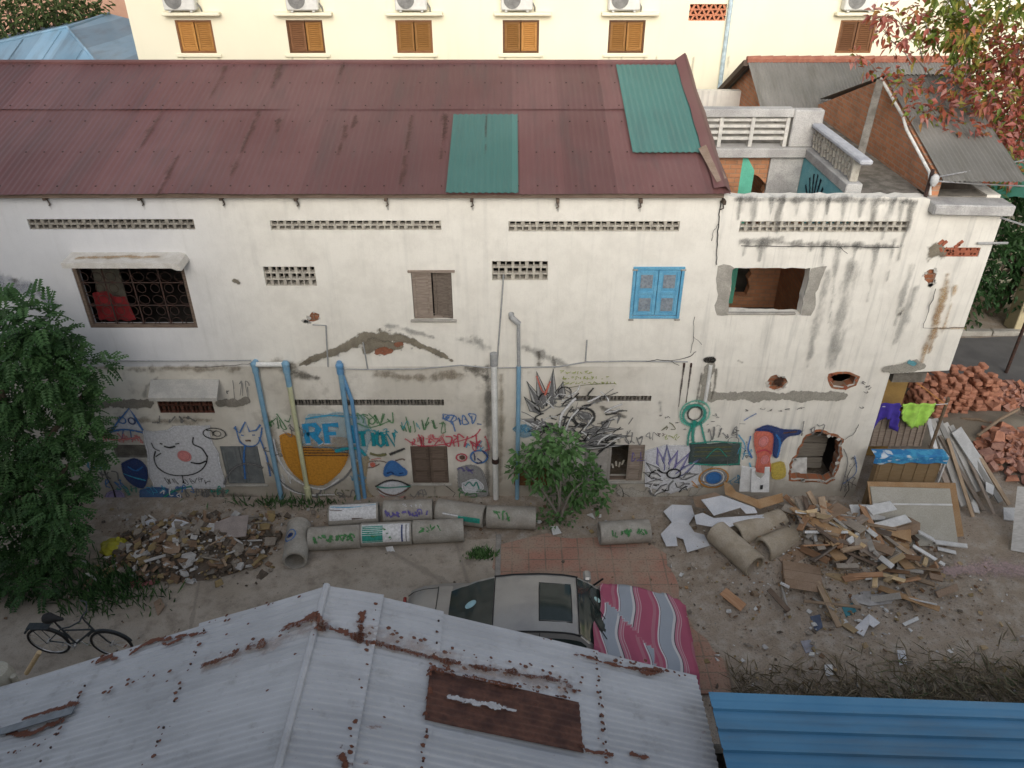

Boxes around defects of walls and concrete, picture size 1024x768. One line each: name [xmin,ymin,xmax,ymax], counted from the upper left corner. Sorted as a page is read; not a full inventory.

spalling [922,239,964,288]
spalling [299,328,453,366]
spalling [765,375,787,390]
spalling [827,372,860,390]
spalling [788,429,844,484]
rust [91,614,266,701]
rust [278,602,686,768]
rust [6,691,82,754]